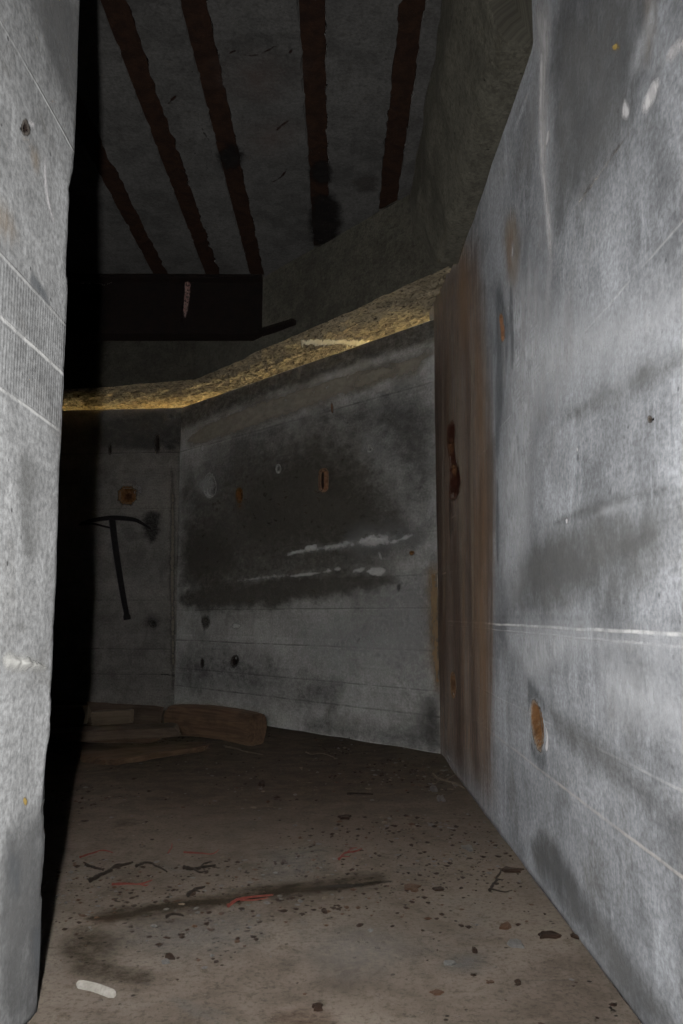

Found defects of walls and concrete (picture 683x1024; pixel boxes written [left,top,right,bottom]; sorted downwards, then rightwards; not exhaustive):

water stain [143,432,416,685]
rust [428,247,492,785]